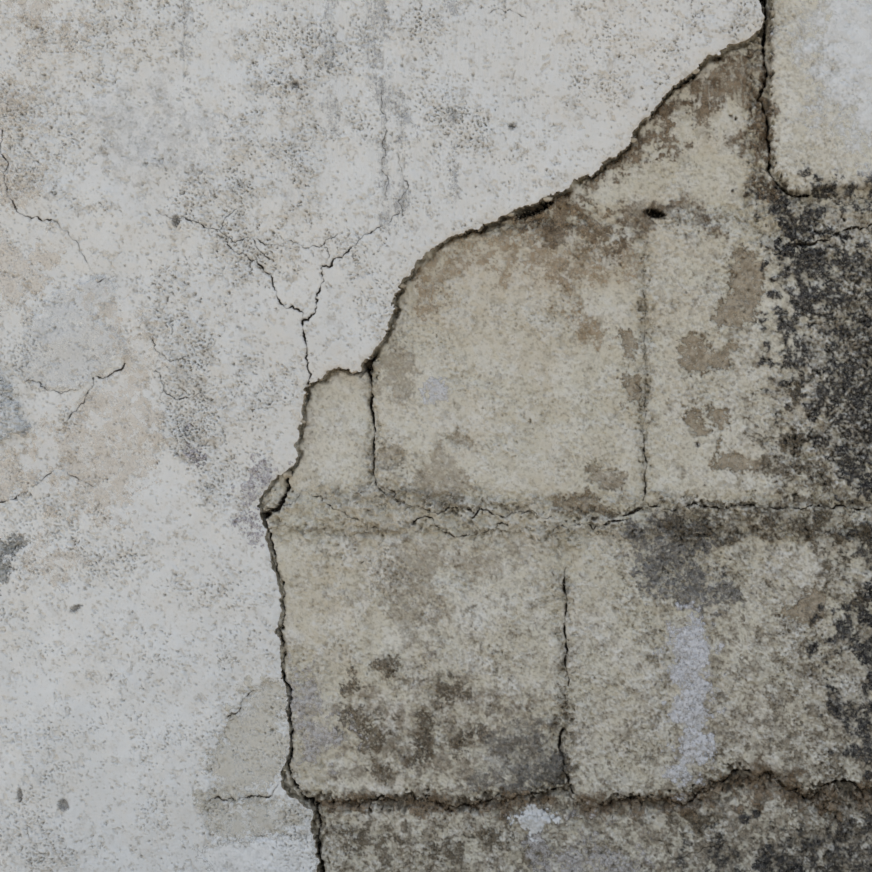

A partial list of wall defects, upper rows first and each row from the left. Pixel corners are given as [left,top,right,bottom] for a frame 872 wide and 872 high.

crack [757,1,863,205]
crack [178,217,350,385]
peeling [0,533,28,584]
water stain [232,454,277,548]
crack [267,478,328,872]
crack [368,368,398,502]
flaking render [257,6,772,872]
crack [562,577,570,684]
water stain [289,49,872,872]
crack [413,442,867,537]
spalling [775,582,826,628]
crack [350,729,574,812]